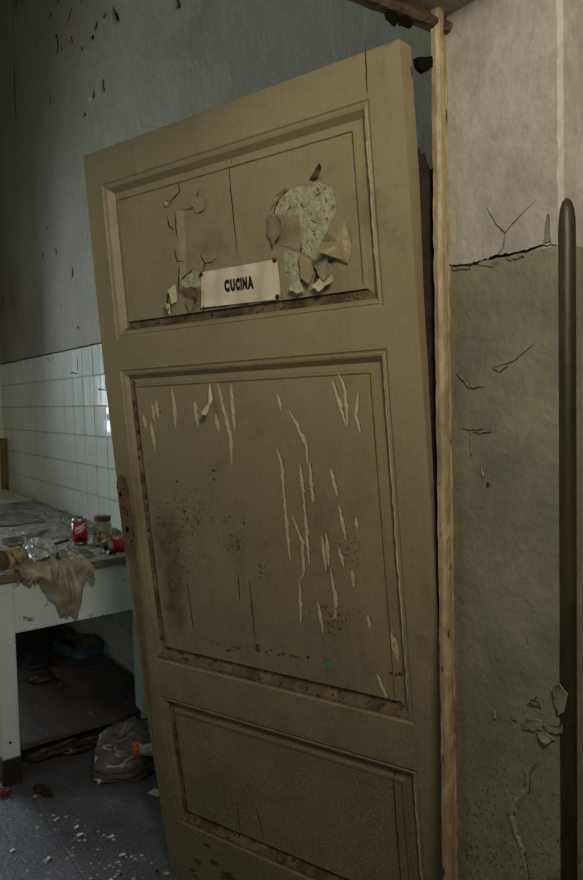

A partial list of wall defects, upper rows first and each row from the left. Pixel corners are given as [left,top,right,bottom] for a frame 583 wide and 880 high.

peeling [384,11,414,29]
crack [449,202,554,270]
spalling [510,684,568,744]